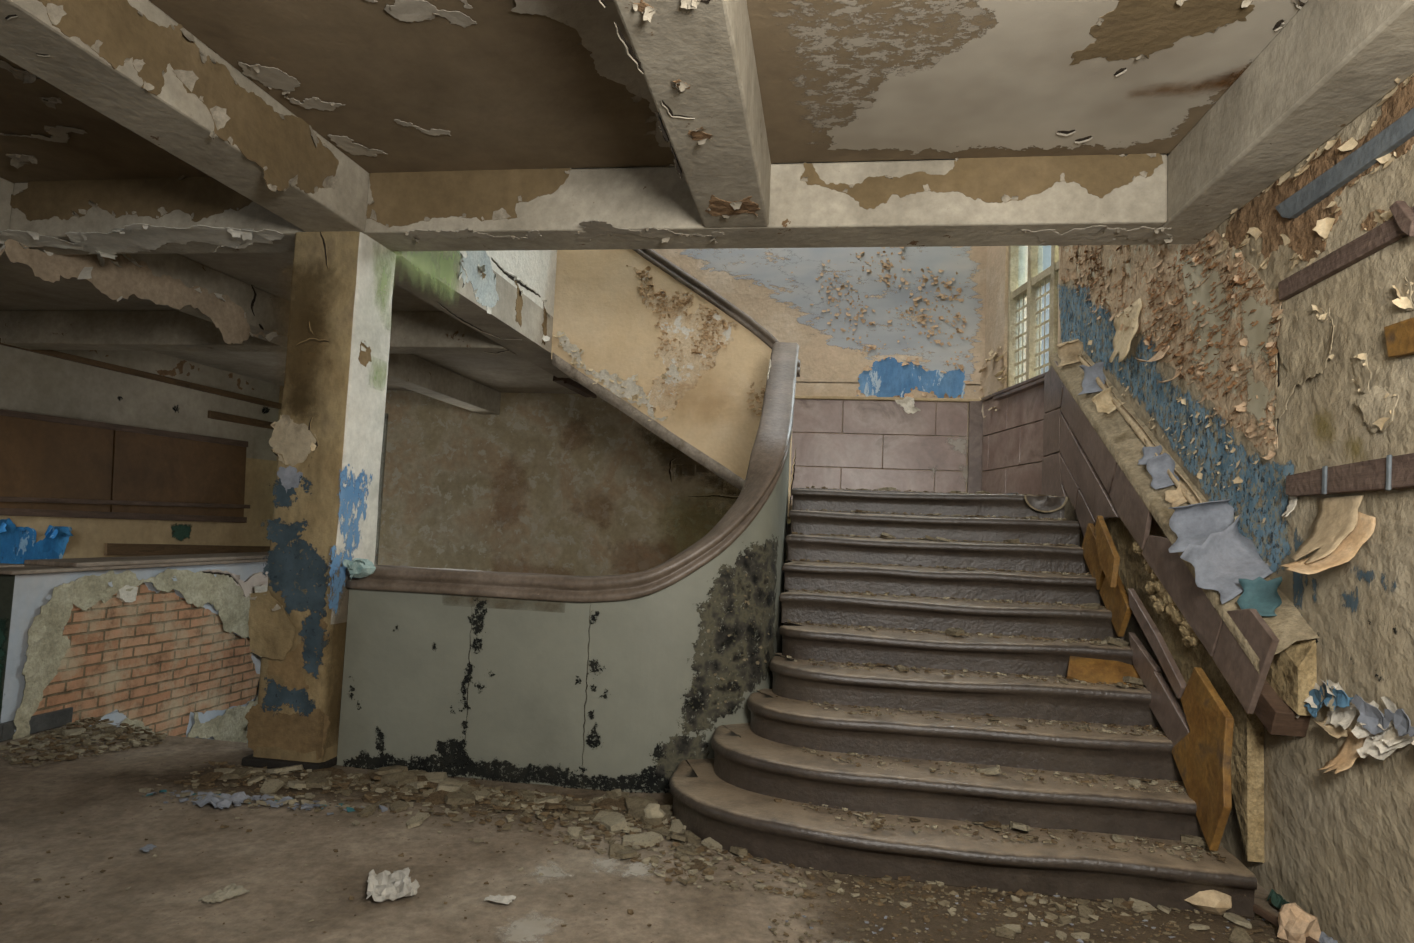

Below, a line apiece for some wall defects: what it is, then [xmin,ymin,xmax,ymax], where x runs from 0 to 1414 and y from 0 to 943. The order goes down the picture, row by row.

peeling [0,154,284,344]
leakage [283,269,323,411]
peeling [38,0,572,314]
peeling [511,0,683,178]
peeling [575,195,1007,418]
peeling [773,0,1308,210]
peeling [1022,73,1414,625]
flaking render [0,407,376,760]
leakage [329,566,361,733]
leakage [343,597,670,793]
crack [582,604,591,773]
peeling [1295,670,1414,774]